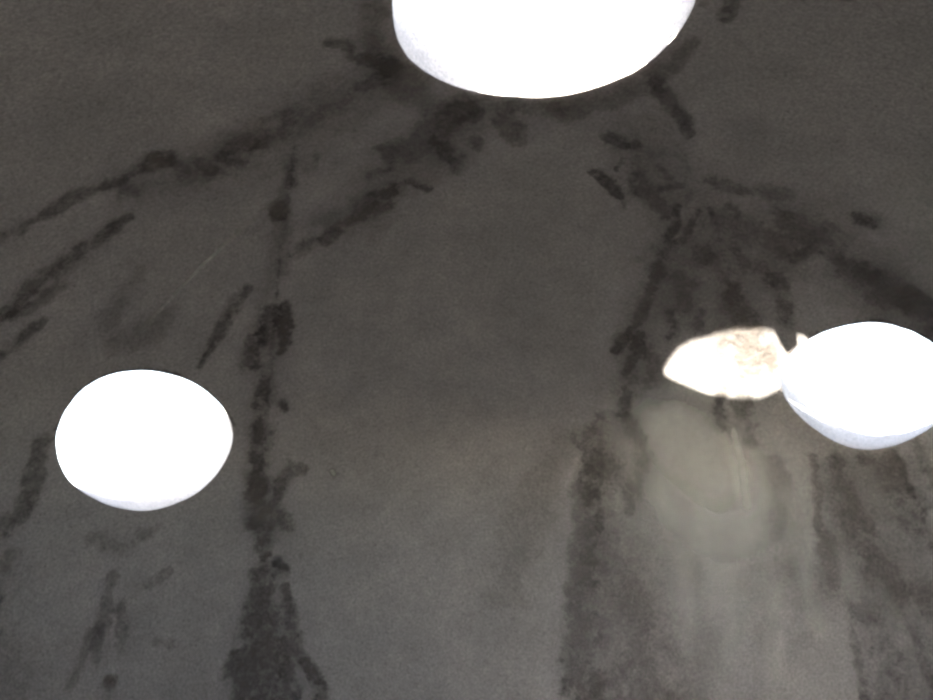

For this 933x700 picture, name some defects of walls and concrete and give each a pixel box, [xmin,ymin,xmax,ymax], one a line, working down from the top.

water stain [198,286,253,368]
water stain [275,301,295,355]
water stain [611,205,768,537]
water stain [718,283,793,375]
water stain [832,256,933,343]
water stain [0,381,95,534]
water stain [223,382,327,700]